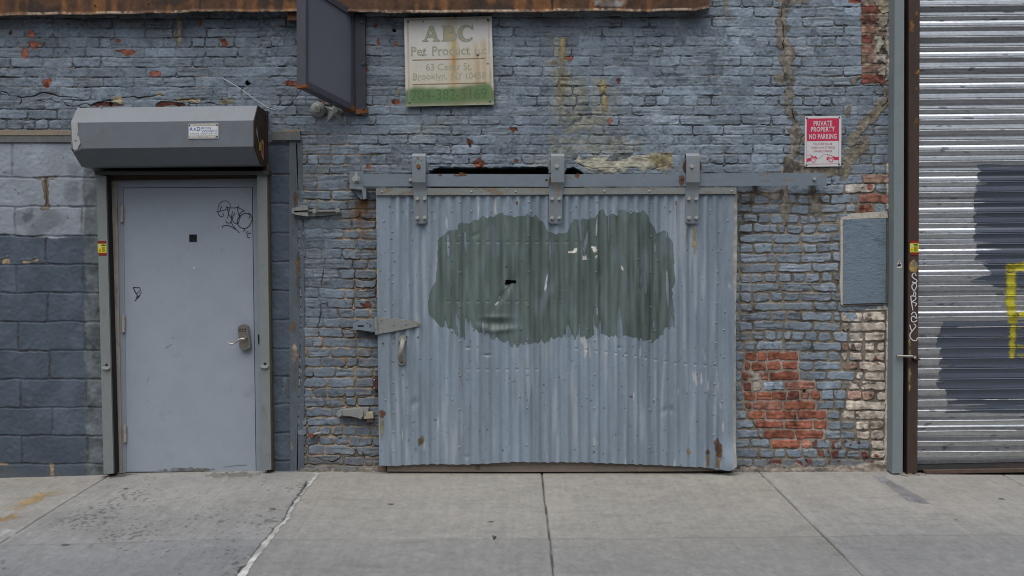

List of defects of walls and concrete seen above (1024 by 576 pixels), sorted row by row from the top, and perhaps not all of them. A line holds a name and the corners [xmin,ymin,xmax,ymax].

damp [548,38,608,152]
crack [773,0,809,173]
spalling [848,0,889,85]
damp [574,146,673,173]
peeling [741,308,888,467]
corrosion [706,439,722,467]